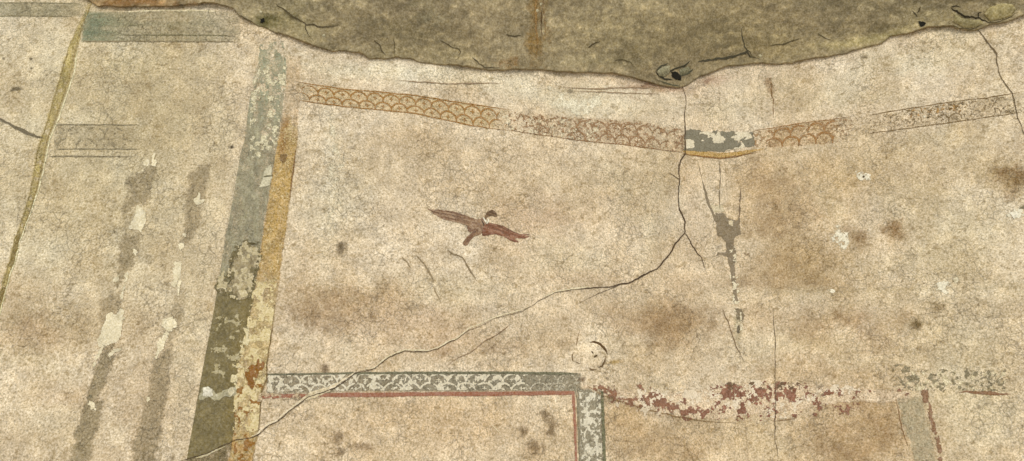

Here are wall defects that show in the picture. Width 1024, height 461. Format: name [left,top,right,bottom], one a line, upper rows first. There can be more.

crack [951,5,1024,133]
peeling [686,131,752,150]
flaking render [199,239,277,433]
crack [180,89,708,461]
peeling [593,380,871,421]